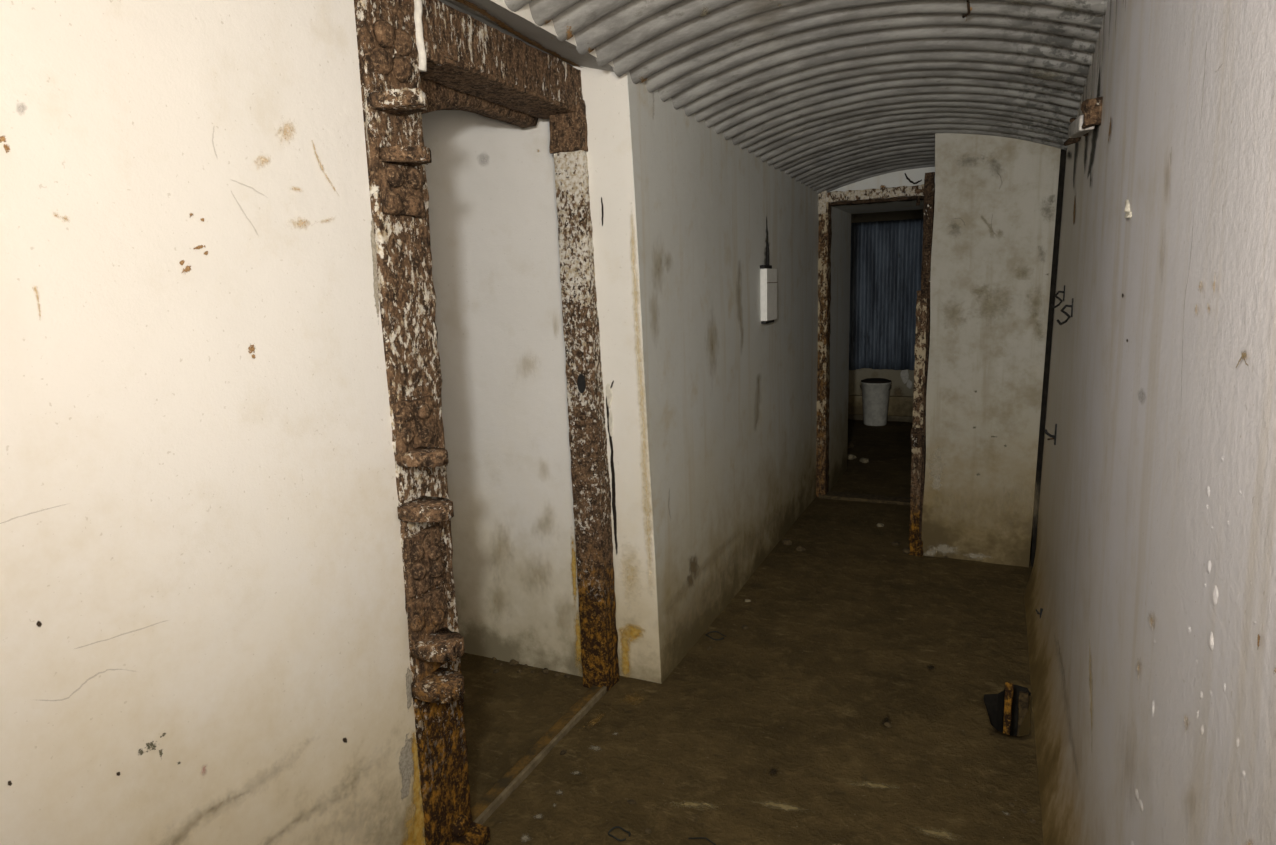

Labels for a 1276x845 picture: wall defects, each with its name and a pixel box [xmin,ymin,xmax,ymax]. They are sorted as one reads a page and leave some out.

corrosion [455,0,594,68]
corrosion [621,626,641,675]
corrosion [402,734,425,845]